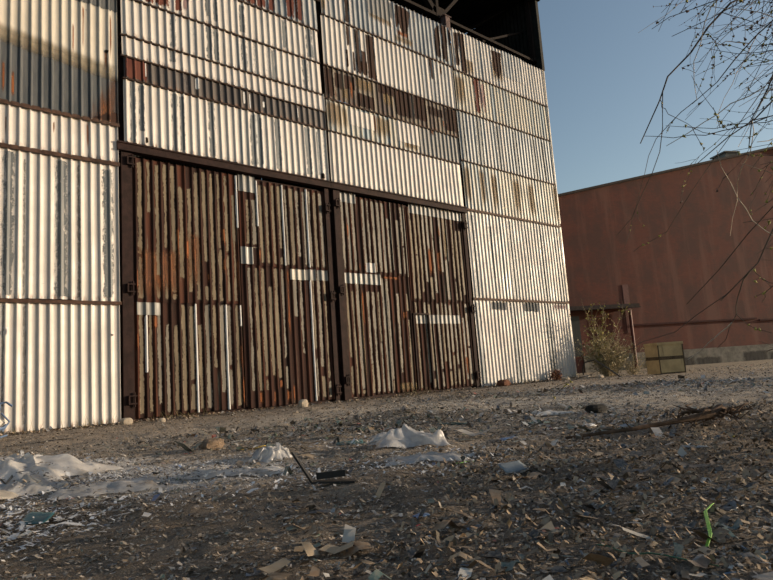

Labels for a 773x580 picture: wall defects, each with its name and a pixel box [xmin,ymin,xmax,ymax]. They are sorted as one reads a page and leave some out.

corrosion [125,57,148,81]
corrosion [147,0,189,11]
corrosion [286,0,303,21]
corrosion [324,0,458,135]
peeling [0,150,26,295]
peeling [54,160,81,298]
peeling [101,169,115,298]
corrosion [137,229,199,293]
peeling [340,200,488,394]
corrosion [428,227,456,272]
peeling [488,226,496,278]
peeling [491,221,567,382]